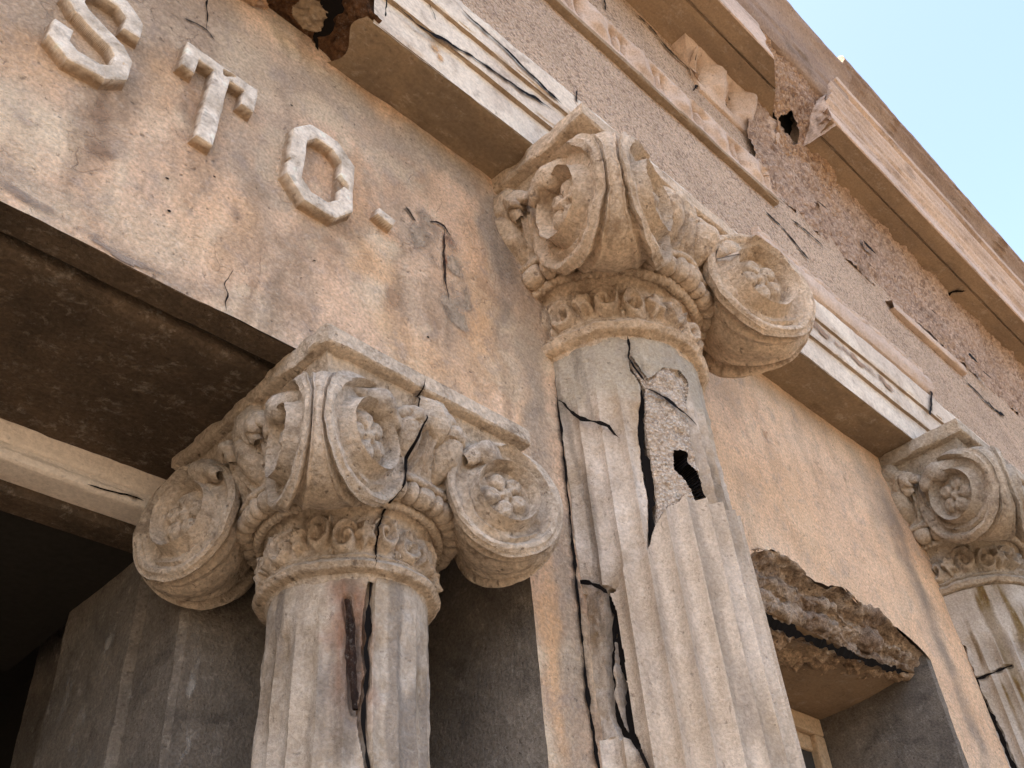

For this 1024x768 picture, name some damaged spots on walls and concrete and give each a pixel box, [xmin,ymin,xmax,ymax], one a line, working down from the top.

spalling [244,0,382,61]
crack [385,0,578,111]
spalling [746,91,1024,418]
crack [88,484,144,501]
spalling [630,357,706,545]
crack [361,382,428,768]
crack [555,336,696,768]
corrosion [344,599,359,711]
crack [975,665,1017,768]